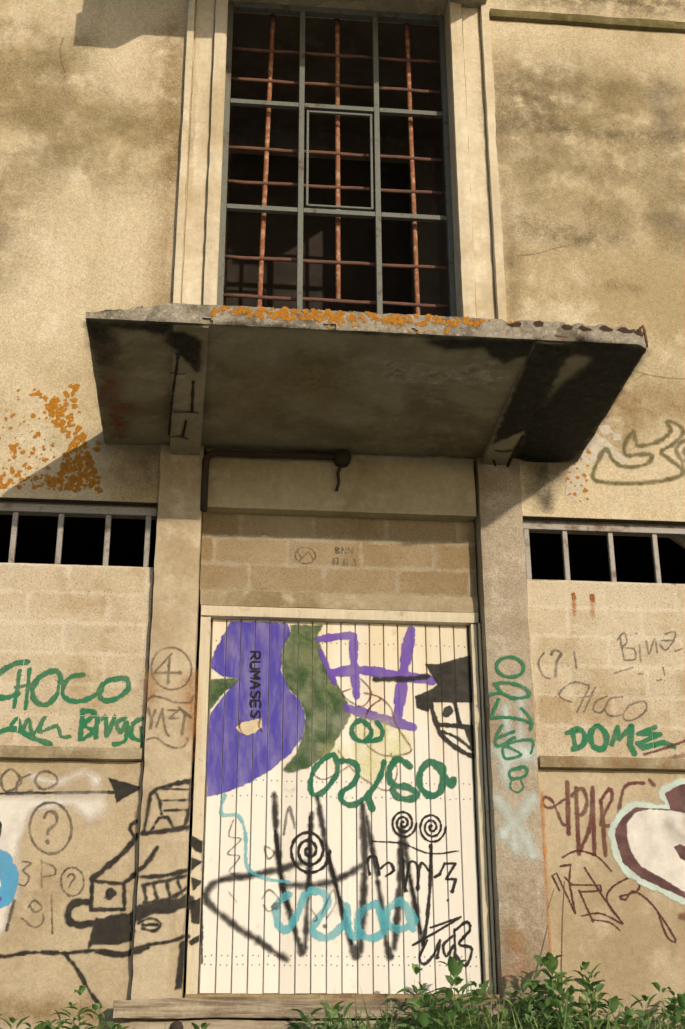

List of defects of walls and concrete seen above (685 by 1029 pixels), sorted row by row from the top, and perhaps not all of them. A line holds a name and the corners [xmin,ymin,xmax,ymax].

water stain [84,321,202,434]